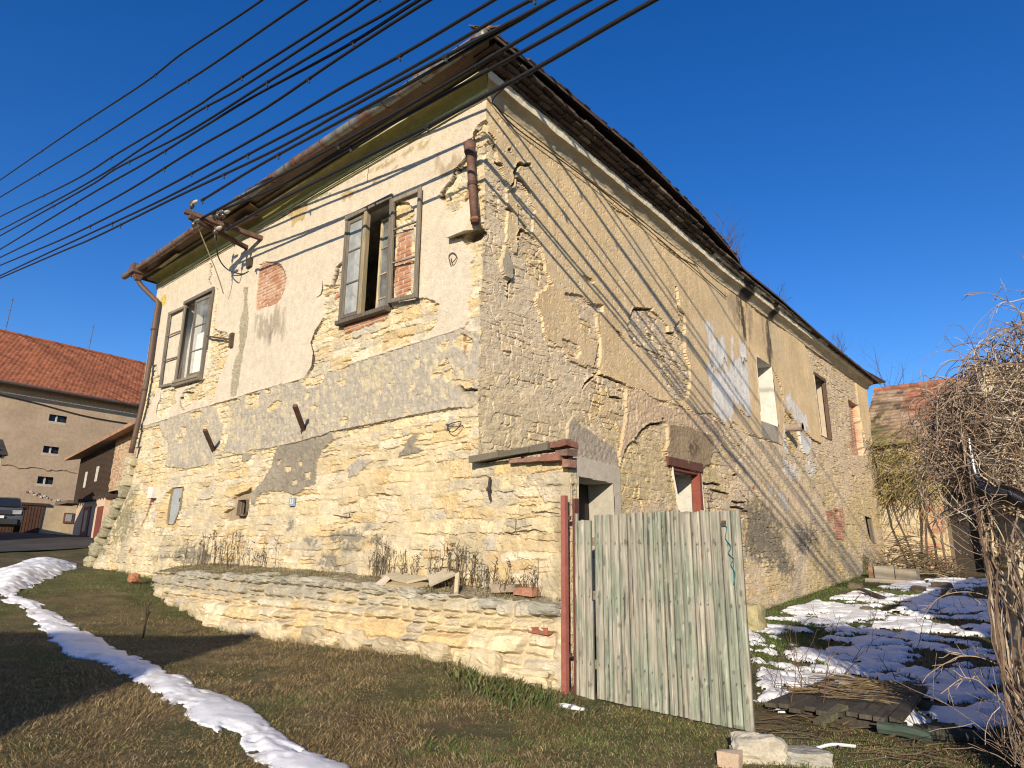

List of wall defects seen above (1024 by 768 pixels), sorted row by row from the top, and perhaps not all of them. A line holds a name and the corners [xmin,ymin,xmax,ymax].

flaking render [257,261,287,311]
peeling [303,120,489,409]
peeling [502,246,514,279]
spalling [565,292,605,367]
spalling [627,286,692,401]
peeling [142,288,282,453]
crack [638,417,667,433]
spalling [635,418,670,453]
flaking render [825,508,846,541]